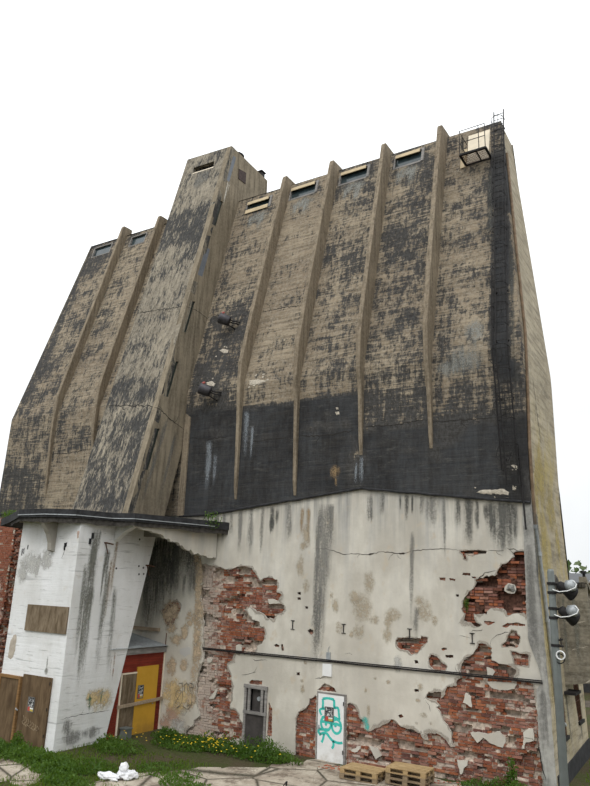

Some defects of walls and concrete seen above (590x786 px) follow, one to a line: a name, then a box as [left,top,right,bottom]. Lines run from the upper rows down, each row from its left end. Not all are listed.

water stain [205,443,216,480]
water stain [78,534,116,663]
water stain [216,507,278,543]
water stain [301,506,338,634]
crack [315,548,455,559]
water stain [400,496,446,538]
water stain [457,500,517,546]
flaking render [160,554,285,741]
flaking render [346,549,544,786]
flaking render [295,684,336,758]